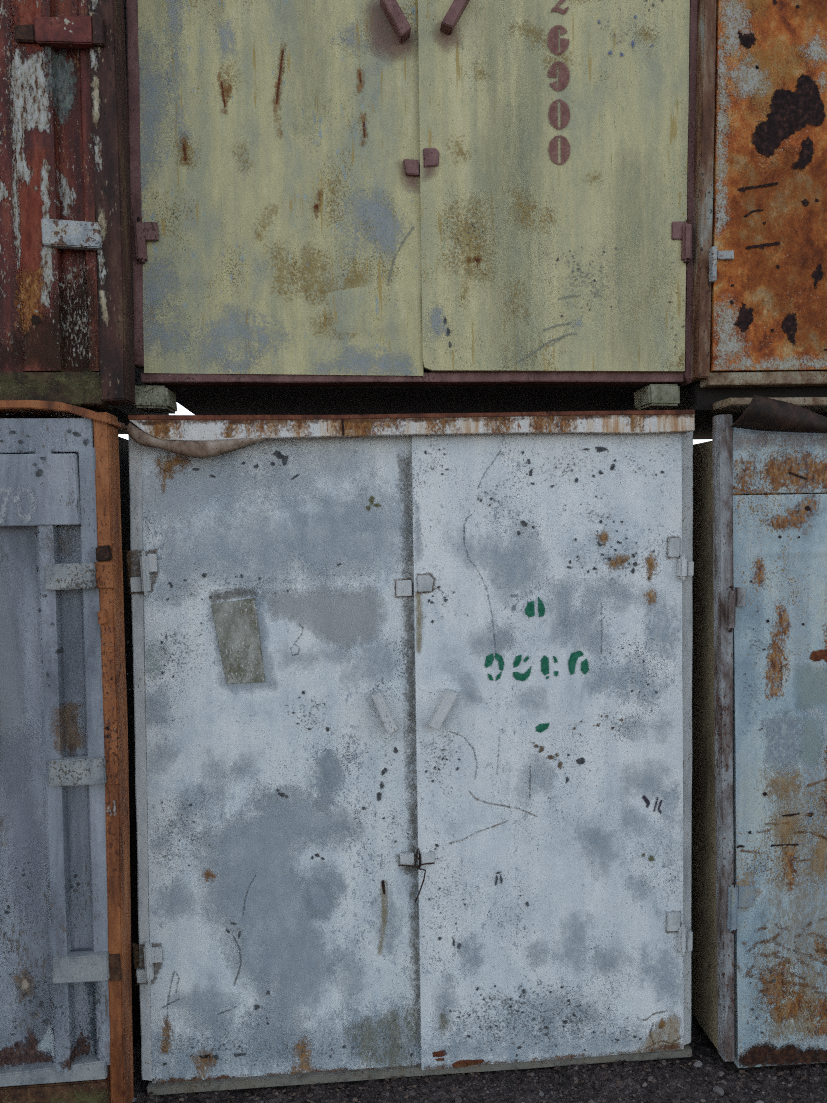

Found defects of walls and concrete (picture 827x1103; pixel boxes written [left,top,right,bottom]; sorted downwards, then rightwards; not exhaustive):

peeling [90,47,102,171]
peeling [0,44,76,297]
peeling [35,209,109,366]
rust [137,415,610,439]
rust [156,455,190,492]
rust [733,451,827,539]
rust [609,555,630,570]
rust [644,555,657,603]
rust [751,558,766,587]
rust [764,605,805,700]
rust [810,629,827,662]
rust [738,960,827,1068]